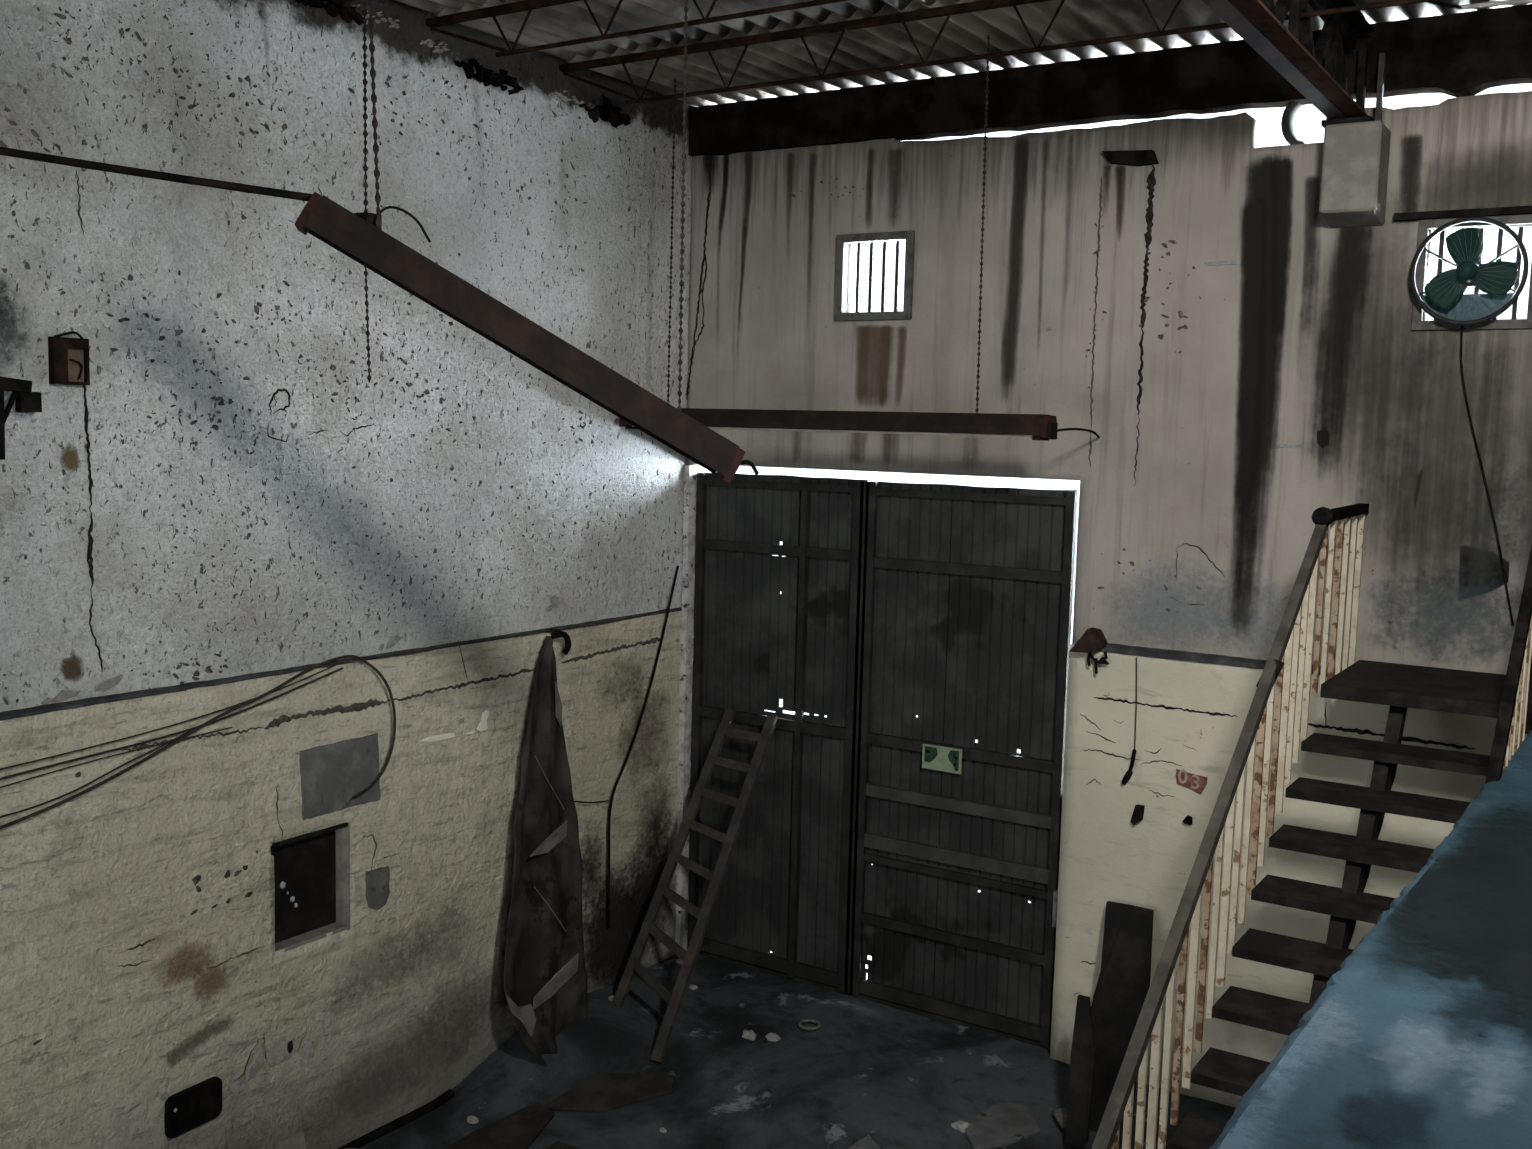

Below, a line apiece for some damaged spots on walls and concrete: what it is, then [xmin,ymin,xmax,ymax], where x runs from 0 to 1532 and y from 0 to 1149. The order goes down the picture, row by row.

damp [0,281,26,363]
damp [704,151,752,318]
damp [1002,138,1047,387]
crack [1088,177,1103,466]
crack [1134,165,1156,486]
damp [1233,157,1318,625]
damp [1318,226,1371,458]
crack [82,346,103,671]
crack [122,637,665,752]
crack [1082,697,1237,797]
rust [167,947,225,994]
damp [582,785,675,986]